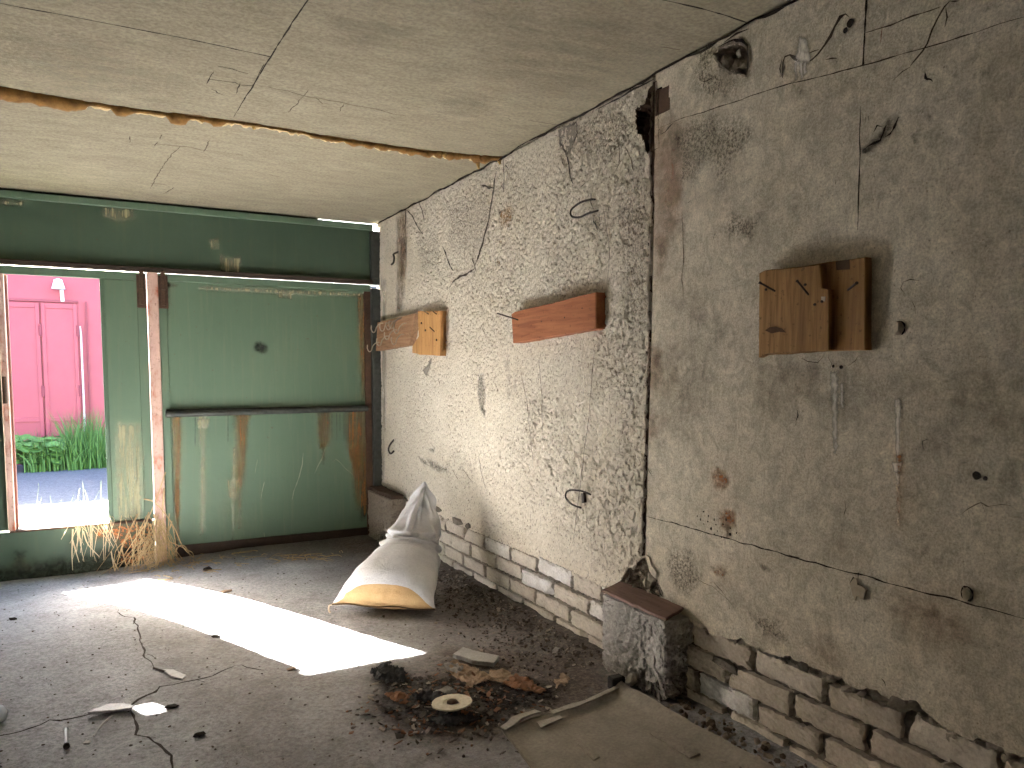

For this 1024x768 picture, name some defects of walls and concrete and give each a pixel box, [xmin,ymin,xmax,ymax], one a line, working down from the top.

crack [0,0,404,116]
spalling [711,38,751,78]
spalling [635,81,670,154]
crack [129,135,209,193]
crack [378,0,1024,619]
spalling [620,555,664,598]
crack [118,610,260,768]
spalling [727,638,888,707]
crack [0,714,90,736]
spalling [917,712,1024,764]